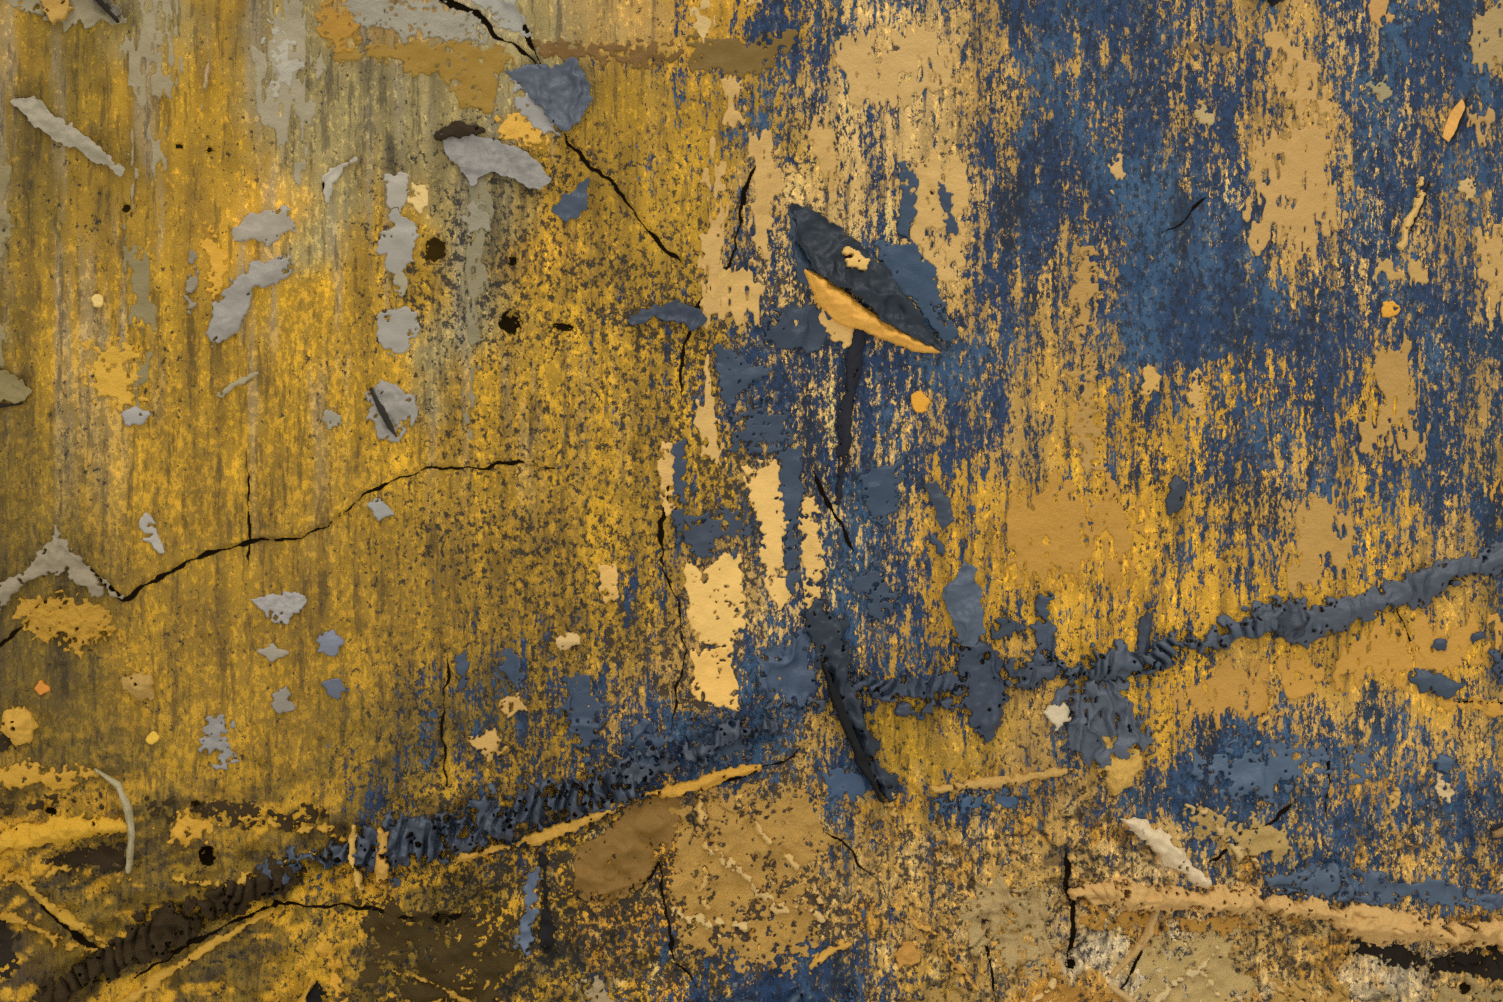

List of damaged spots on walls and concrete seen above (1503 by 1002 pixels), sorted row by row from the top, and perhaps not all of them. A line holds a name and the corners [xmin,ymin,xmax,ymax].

crack [439,0,541,64]
peeling [887,149,975,318]
peeling [627,75,948,516]
crack [369,387,397,437]
crack [90,449,559,602]
crack [0,596,54,647]
spalling [467,692,528,763]
spalling [1043,702,1071,731]
peeling [0,757,103,795]
spalling [1148,782,1315,865]
spalling [569,782,842,979]
spalling [950,867,1503,1002]